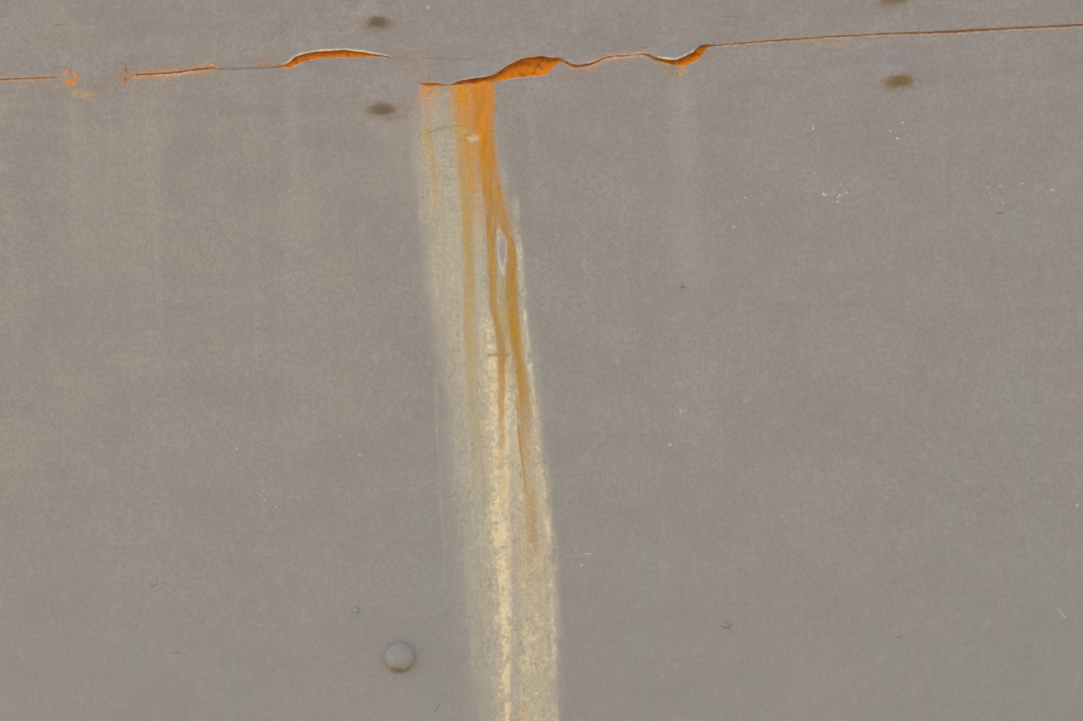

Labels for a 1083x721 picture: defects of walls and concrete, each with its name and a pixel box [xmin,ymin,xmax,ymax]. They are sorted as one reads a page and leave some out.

crack [708,24,1083,47]
crack [562,54,650,68]
crack [133,62,277,78]
crack [0,75,57,83]
corrosion [421,82,557,721]